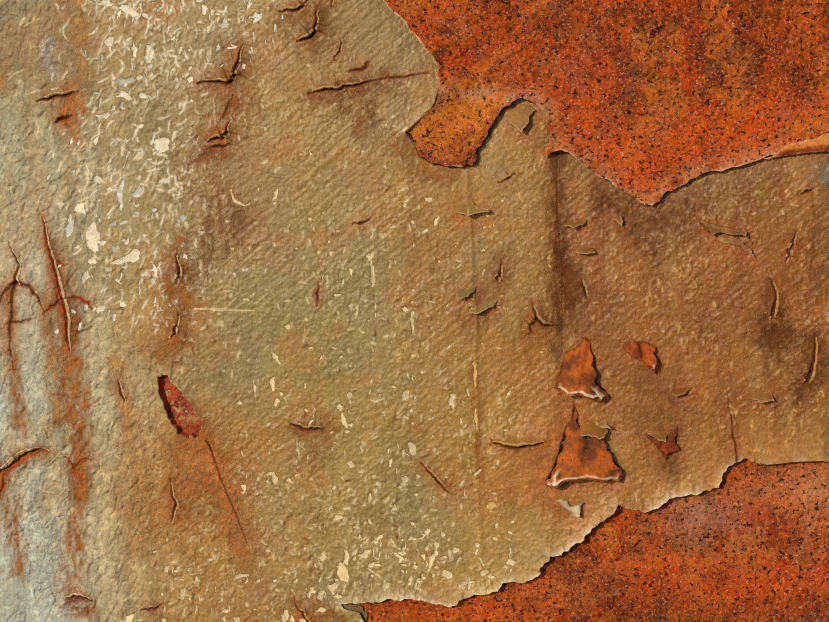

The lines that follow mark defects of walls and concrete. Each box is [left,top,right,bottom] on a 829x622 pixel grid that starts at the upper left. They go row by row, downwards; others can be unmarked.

crack [195,47,243,149]
crack [309,41,426,94]
peeling [383,0,829,206]
crack [0,215,92,365]
corrosion [8,348,26,432]
corrosion [0,450,48,573]
crack [0,447,87,500]
corrosion [40,254,95,618]
peeling [305,522,461,622]
peeling [555,337,609,402]
peeling [545,408,623,488]
corrosion [346,458,829,622]